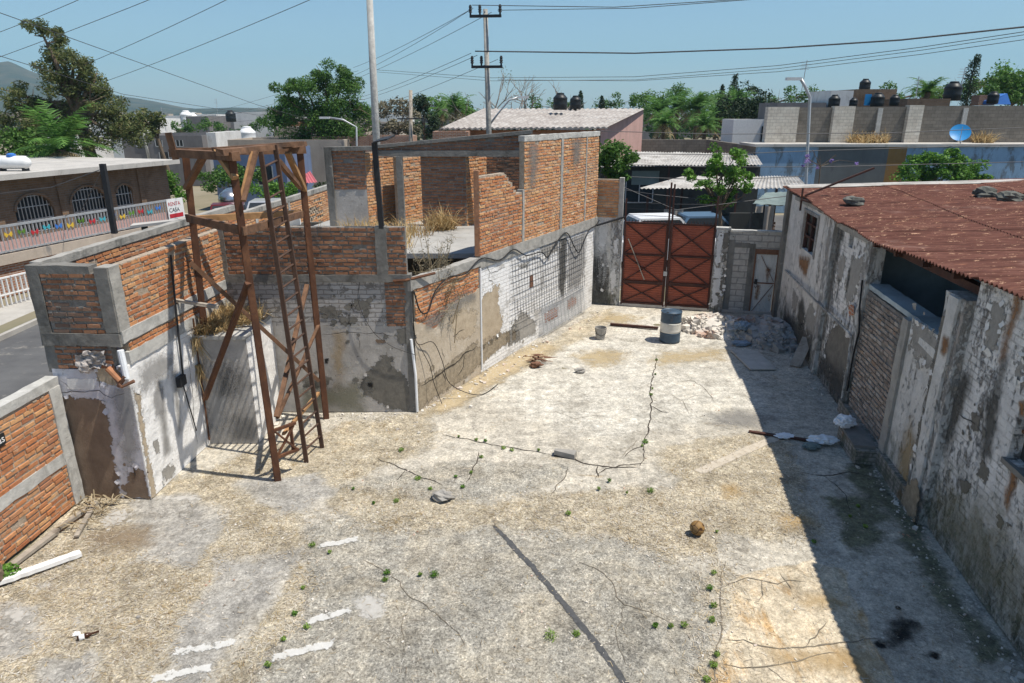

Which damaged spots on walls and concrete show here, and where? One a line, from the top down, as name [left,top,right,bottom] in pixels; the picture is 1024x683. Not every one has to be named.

corrosion [799,257,809,275]
peeling [836,245,865,317]
peeling [319,295,376,344]
crack [423,329,476,385]
flaking render [352,283,577,412]
peeling [976,300,1006,358]
flaking render [63,364,176,500]
crack [379,360,717,494]
flaking render [900,303,945,522]
peeling [962,403,985,441]
peeling [960,460,989,494]
crack [713,561,872,683]